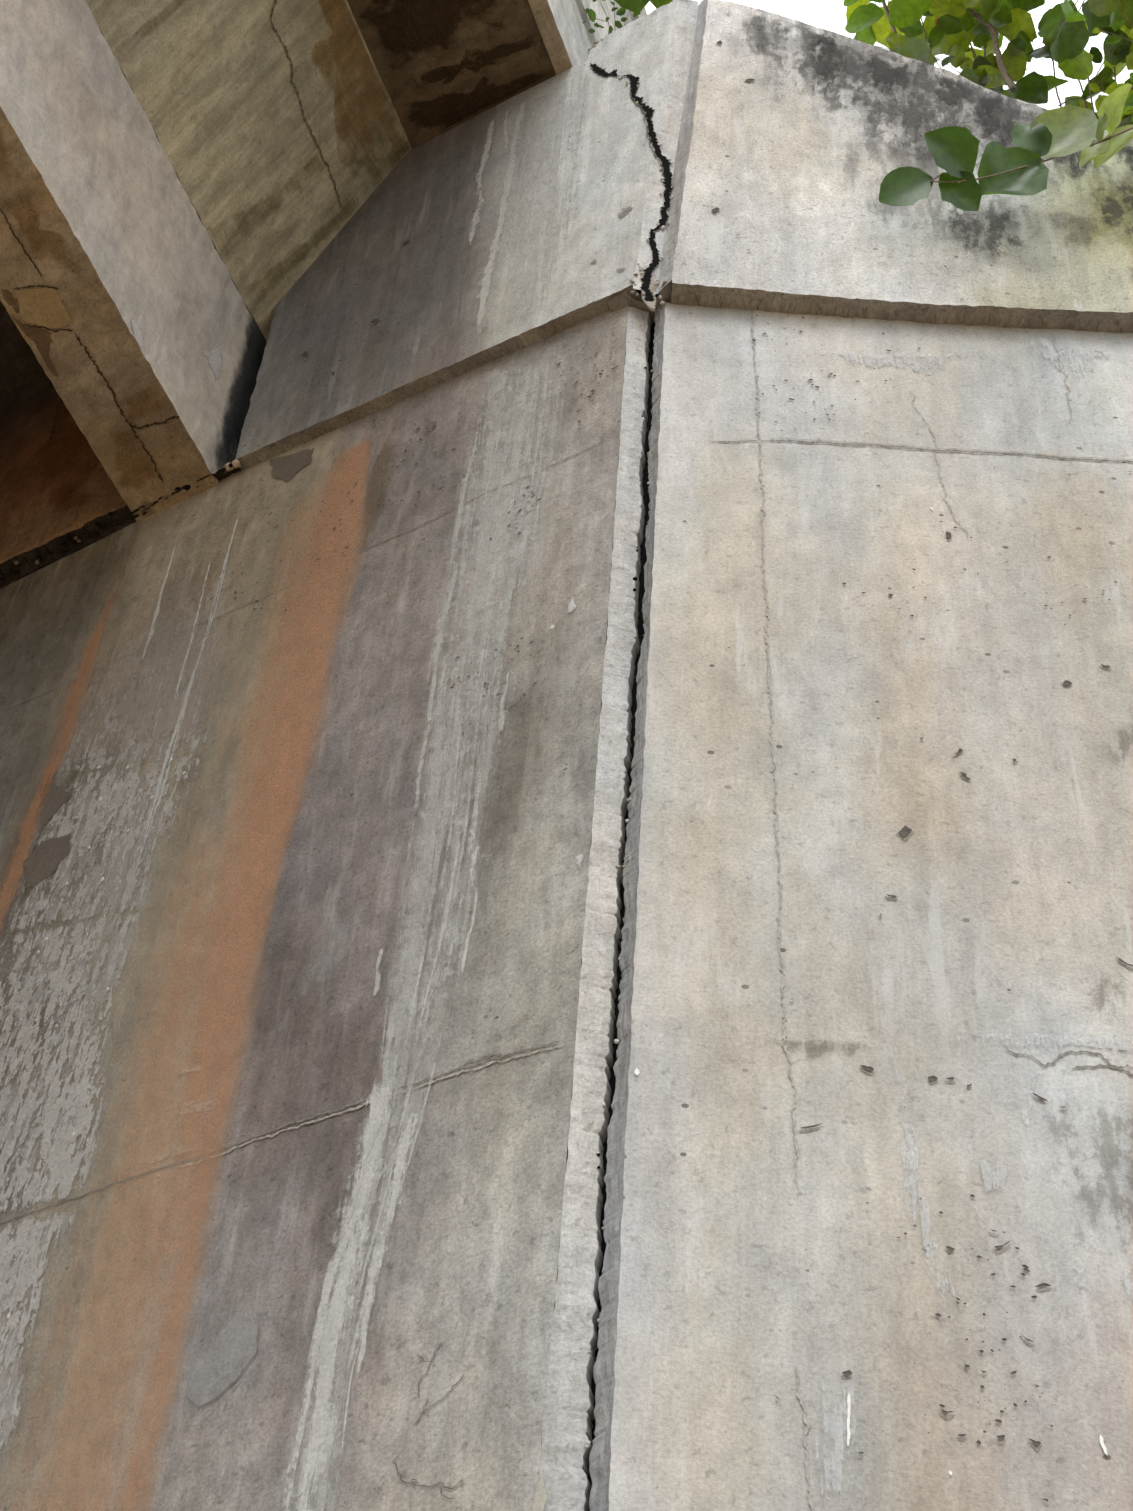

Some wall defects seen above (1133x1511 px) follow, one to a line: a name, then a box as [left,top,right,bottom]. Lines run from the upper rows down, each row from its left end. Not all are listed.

spalling [14,287,72,329]
crack [0,209,180,484]
leakage [770,20,1052,165]
leakage [950,203,1022,256]
leakage [1053,141,1095,177]
leakage [1093,146,1133,234]
corrosion [0,594,115,924]
crack [347,63,673,1499]
crack [712,309,1133,1205]
peeling [0,519,271,1453]
leakage [282,361,566,1511]
crack [0,1040,569,1224]